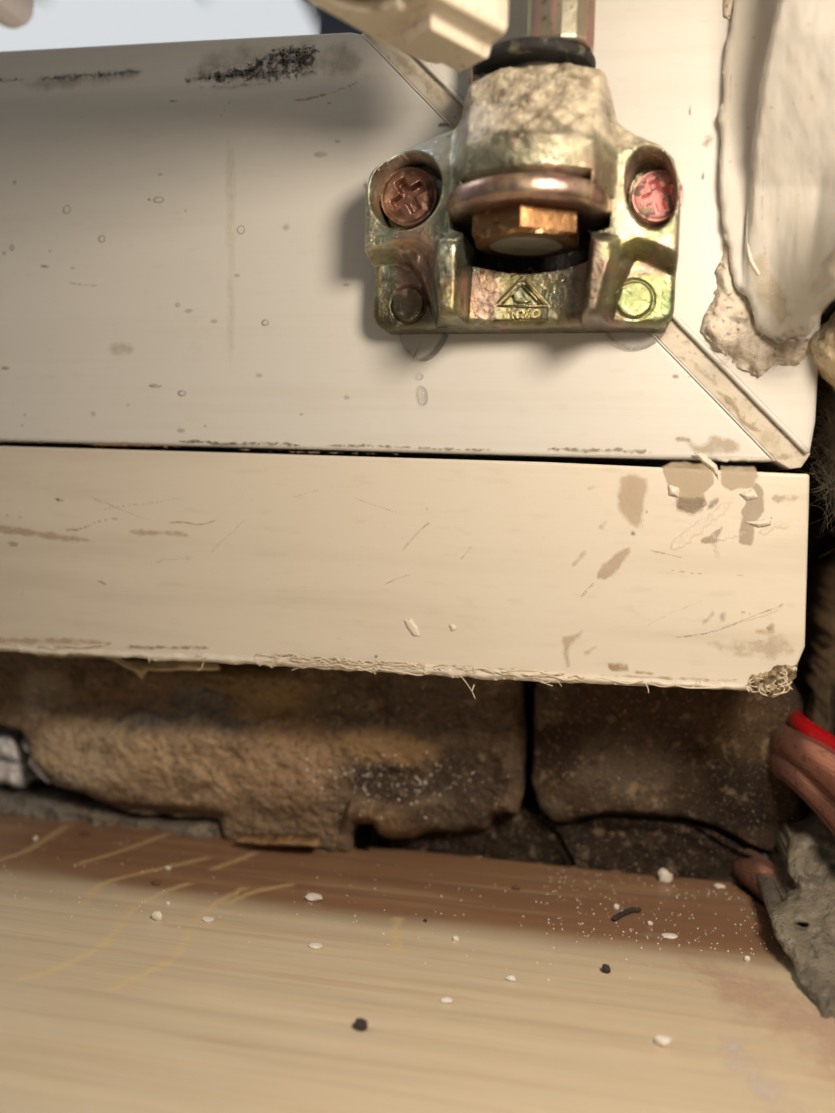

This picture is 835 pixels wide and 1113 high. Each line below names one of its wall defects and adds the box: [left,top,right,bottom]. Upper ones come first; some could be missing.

peeling [694,452,719,479]
peeling [668,485,680,497]
peeling [740,489,758,500]
peeling [747,517,773,527]